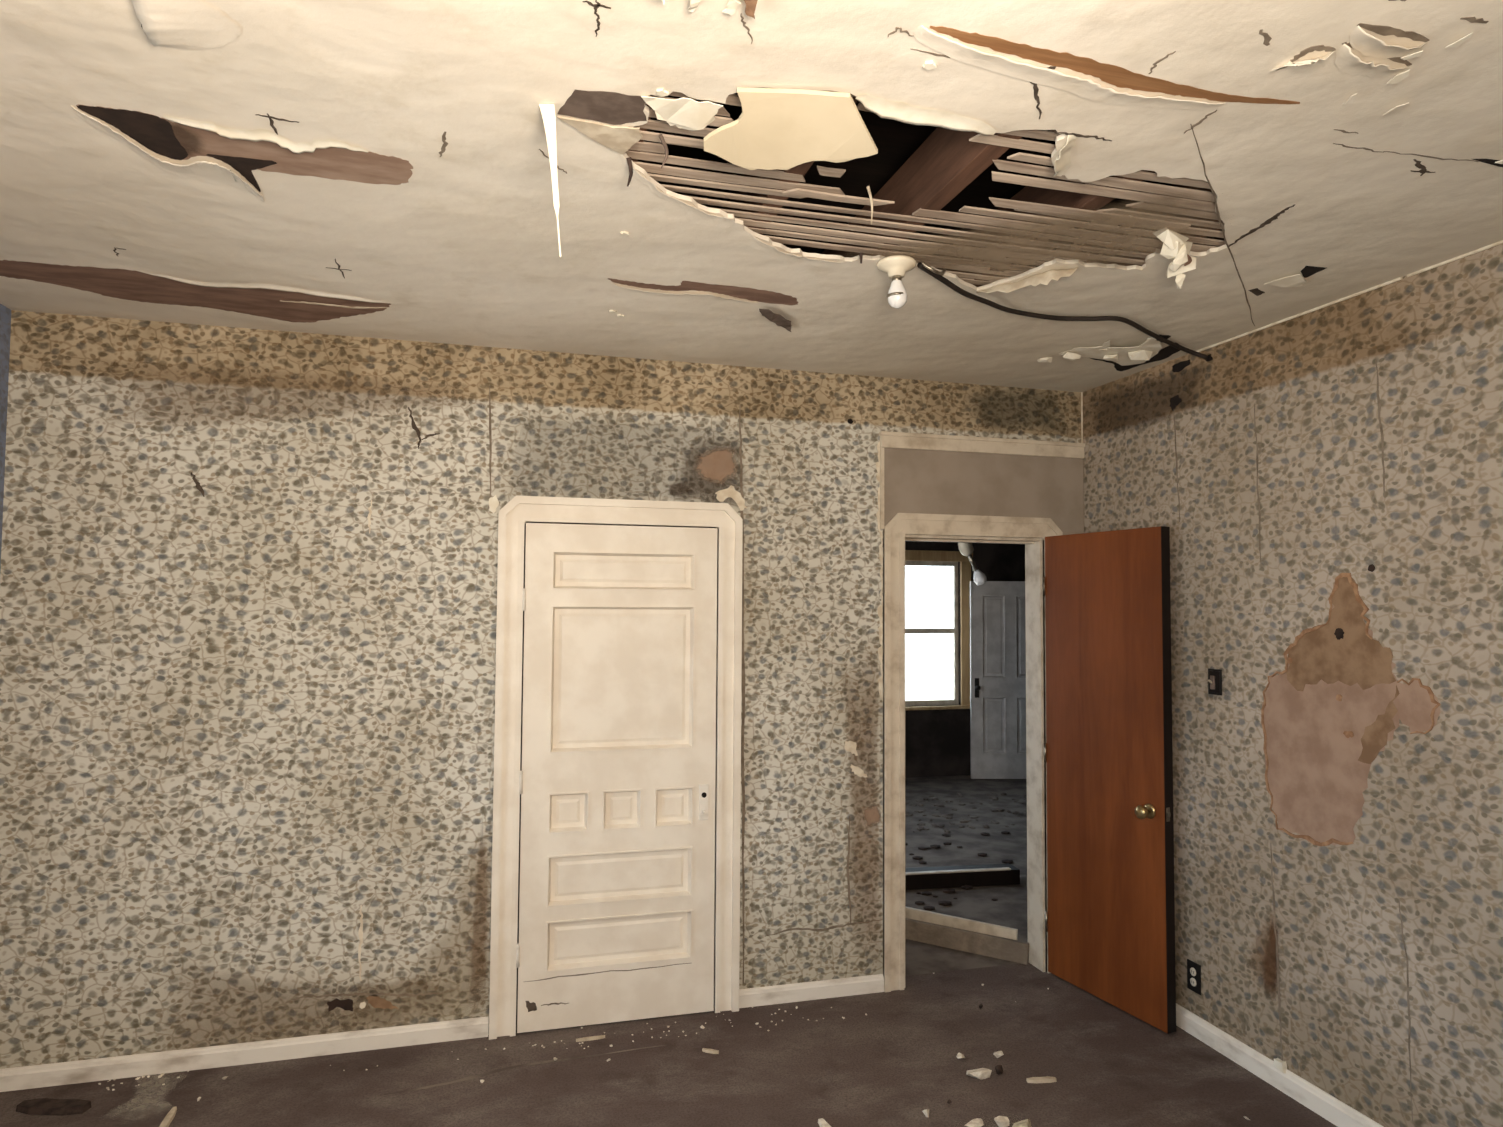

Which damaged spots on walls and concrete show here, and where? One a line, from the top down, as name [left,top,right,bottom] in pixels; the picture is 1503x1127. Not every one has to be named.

peeling [722,0,758,19]
peeling [1268,16,1489,105]
peeling [71,104,413,202]
crack [888,25,1300,326]
crack [1333,129,1479,176]
peeling [1154,227,1196,289]
peeling [0,260,394,323]
peeling [608,278,799,332]
peeling [697,450,735,482]
flaking render [1261,564,1441,846]